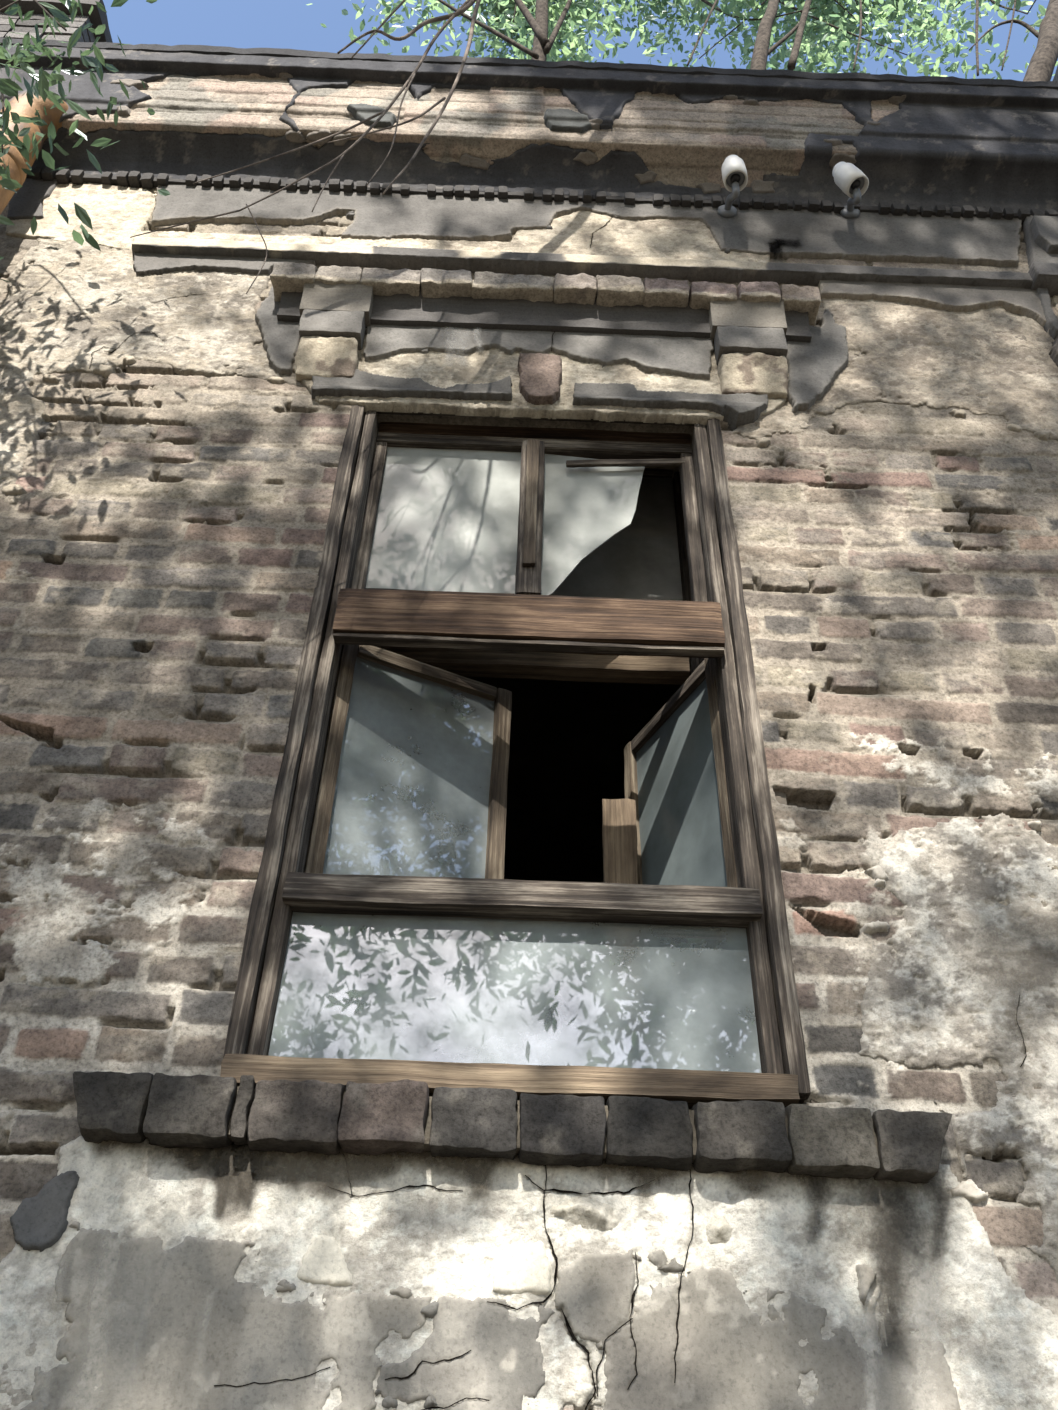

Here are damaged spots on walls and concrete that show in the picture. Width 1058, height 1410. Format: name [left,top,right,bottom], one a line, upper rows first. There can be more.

flaking render [0,72,1058,505]
spalling [0,812,1058,1410]
water stain [96,1140,517,1217]
crack [334,1180,462,1197]
water stain [578,1160,694,1193]
crack [487,1165,654,1410]
crack [674,1172,694,1383]
water stain [728,1169,948,1410]
crack [214,1367,331,1387]
crack [385,1350,471,1380]
crack [422,1397,489,1410]